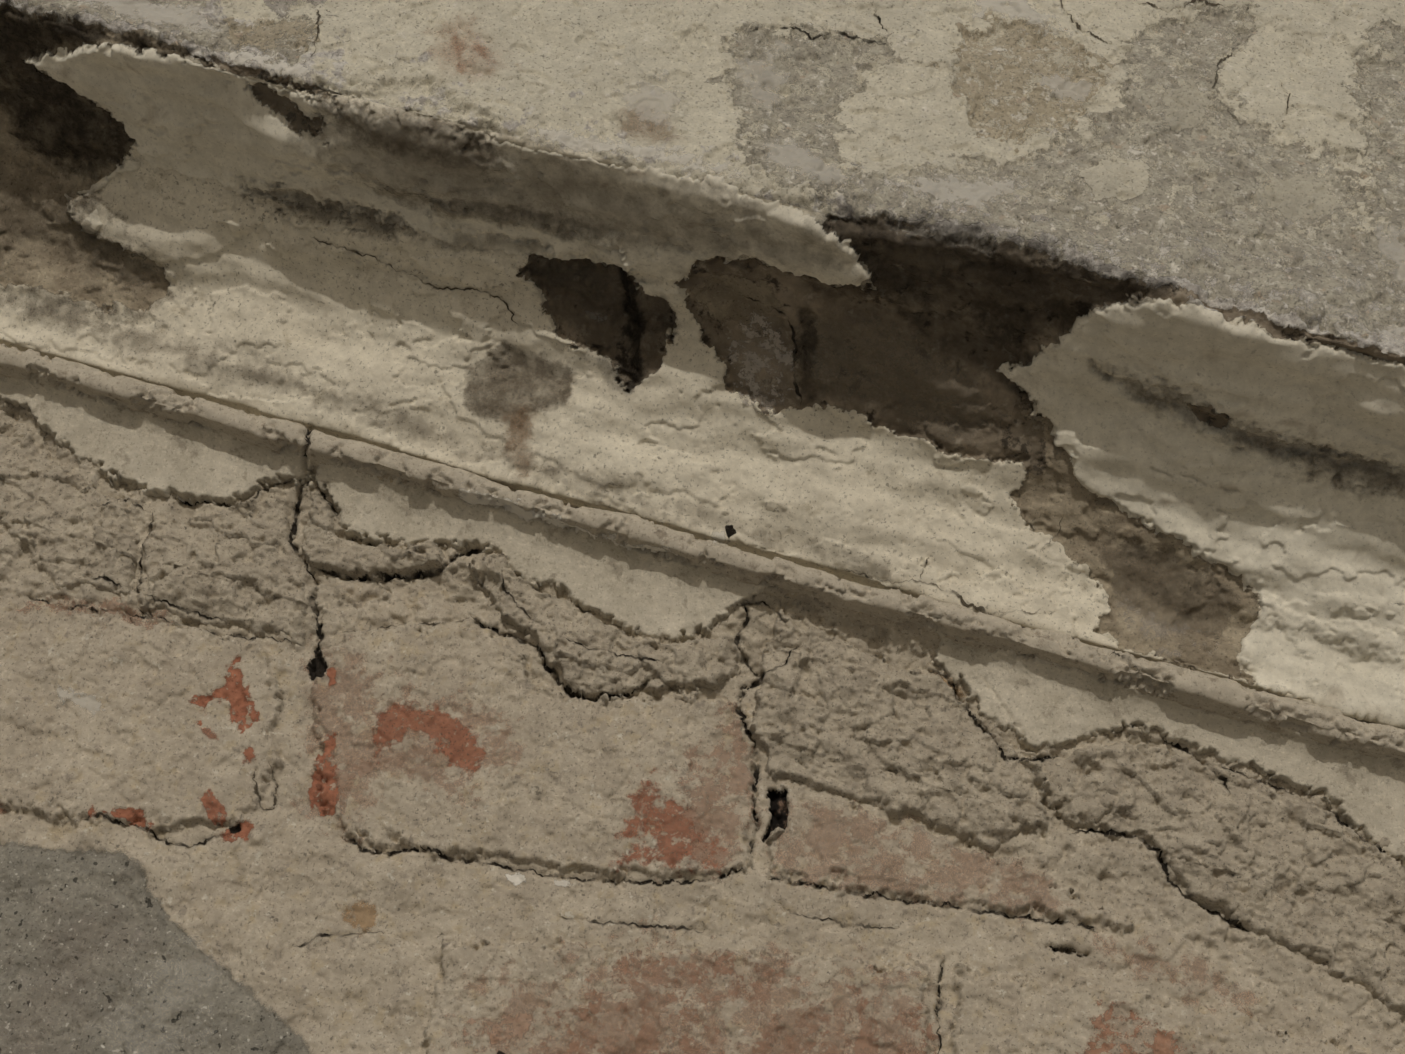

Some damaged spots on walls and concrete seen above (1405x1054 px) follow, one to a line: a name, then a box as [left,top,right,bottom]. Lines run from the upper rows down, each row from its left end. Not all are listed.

water stain [465,345,573,444]
flaking render [0,0,1405,729]
crack [33,430,659,701]
crack [843,558,985,613]
peeling [88,806,154,833]
crack [83,812,215,848]
peeling [188,657,260,764]
peeling [201,788,254,843]
peeling [308,703,486,816]
crack [342,601,1094,957]
crack [1073,828,1249,932]
crack [1219,767,1286,792]